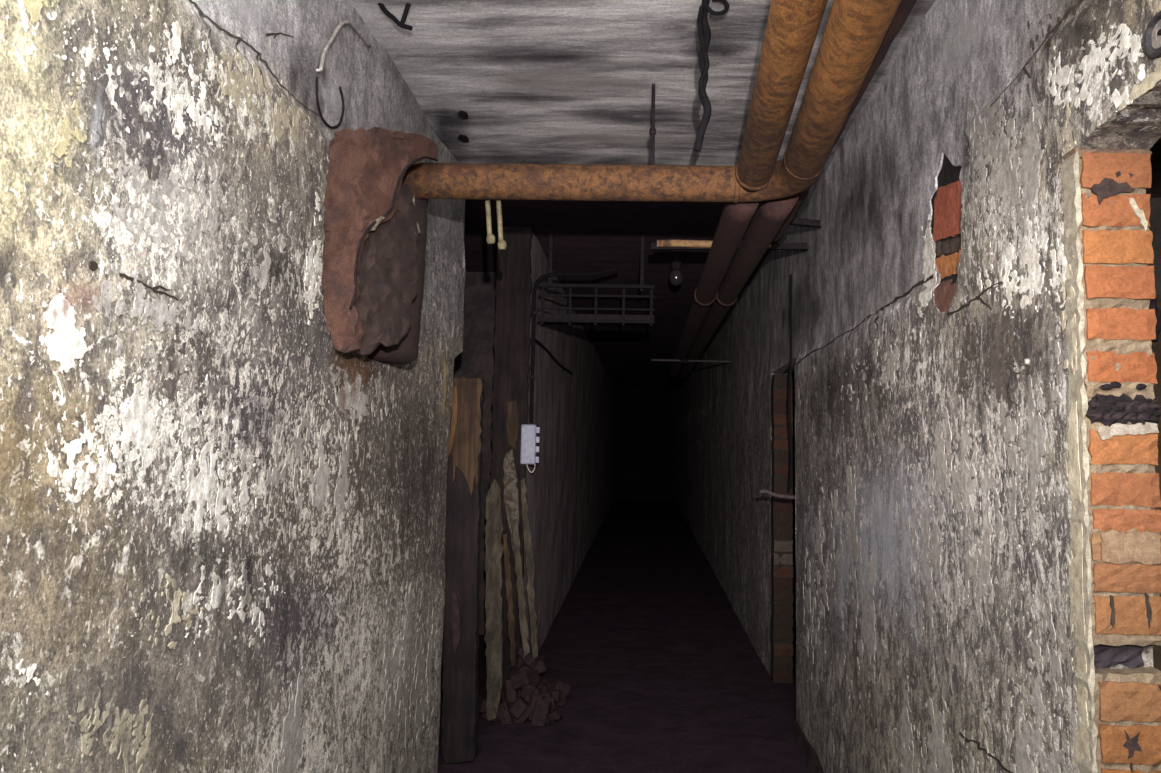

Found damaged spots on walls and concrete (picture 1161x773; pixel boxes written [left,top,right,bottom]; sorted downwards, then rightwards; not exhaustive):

crack [189,0,319,116]
damp [435,116,462,149]
crack [783,274,934,373]
crack [947,282,1002,316]
peeling [801,7,1161,773]